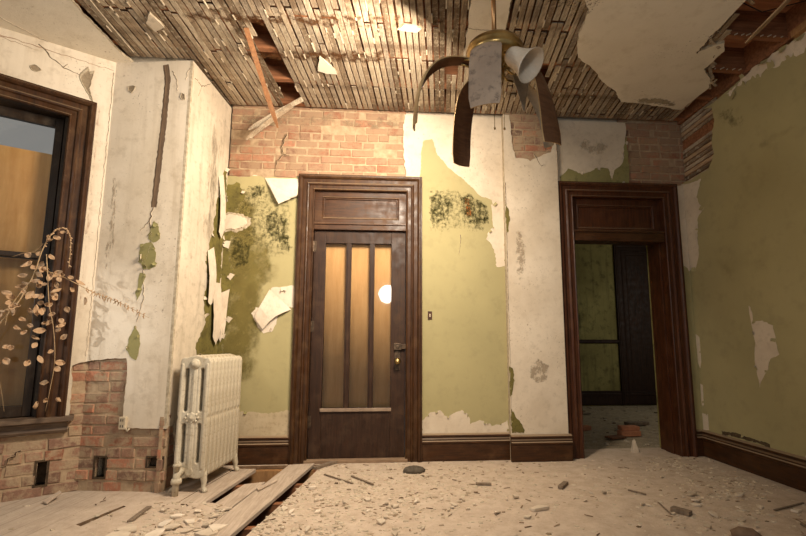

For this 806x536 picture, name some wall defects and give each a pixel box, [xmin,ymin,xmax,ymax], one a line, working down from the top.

flaking render [79,67,95,101]
peeling [727,32,806,100]
crack [0,17,114,277]
flaking render [503,112,552,161]
peeling [135,221,160,299]
water stain [222,186,271,373]
water stain [267,212,290,250]
flaking render [195,104,406,355]
water stain [430,195,488,228]
flaking render [557,119,704,272]
flaking render [0,325,174,502]
peeling [422,409,525,434]